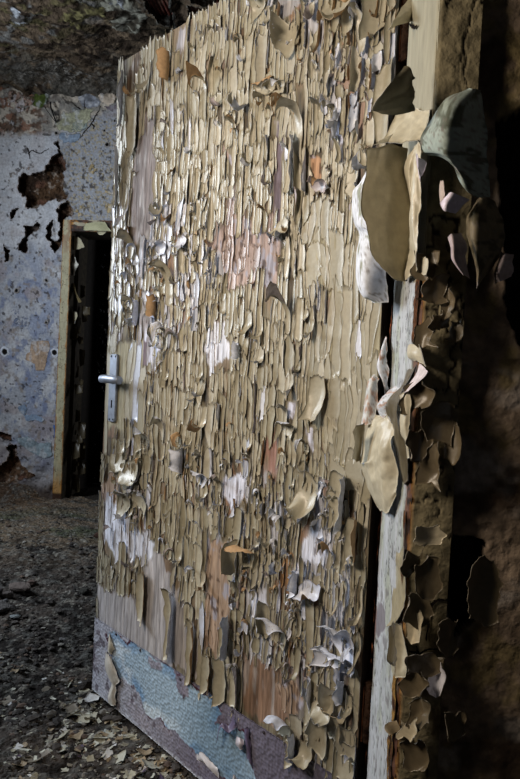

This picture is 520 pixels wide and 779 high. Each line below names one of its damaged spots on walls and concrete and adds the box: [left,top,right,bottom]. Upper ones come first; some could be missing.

flaking render [72,94,100,112]
spalling [11,119,73,253]
peeling [72,236,90,394]
peeling [83,0,520,734]
spalling [0,432,35,483]
peeling [72,410,86,493]
spalling [384,524,503,772]
peeling [263,679,356,779]